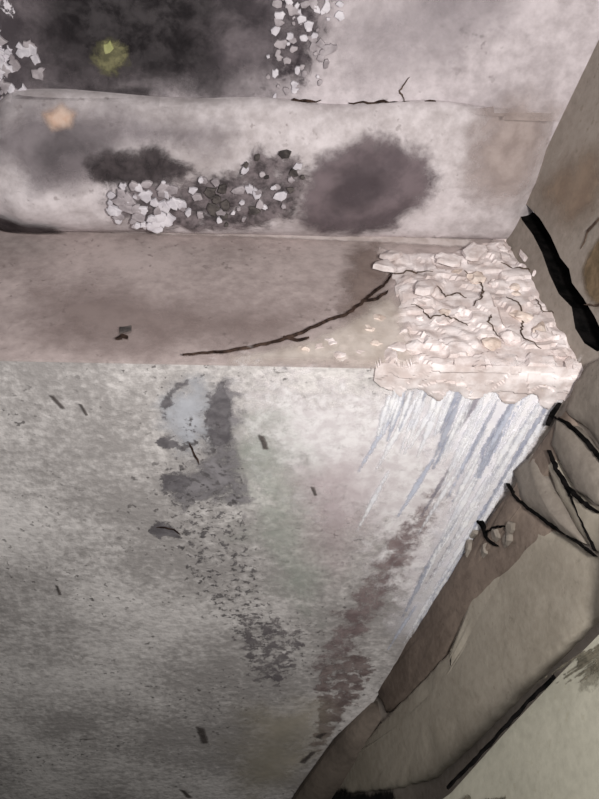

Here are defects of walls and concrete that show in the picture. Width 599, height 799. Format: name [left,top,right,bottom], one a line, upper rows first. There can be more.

peeling [0,30,45,100]
water stain [0,0,317,98]
peeling [265,0,345,98]
water stain [0,116,198,188]
peeling [106,149,309,233]
crack [182,272,393,356]
water stain [140,136,470,361]
crack [521,212,599,351]
crack [545,402,599,460]
water stain [149,372,563,691]
crack [506,450,599,557]
rust [309,507,433,754]